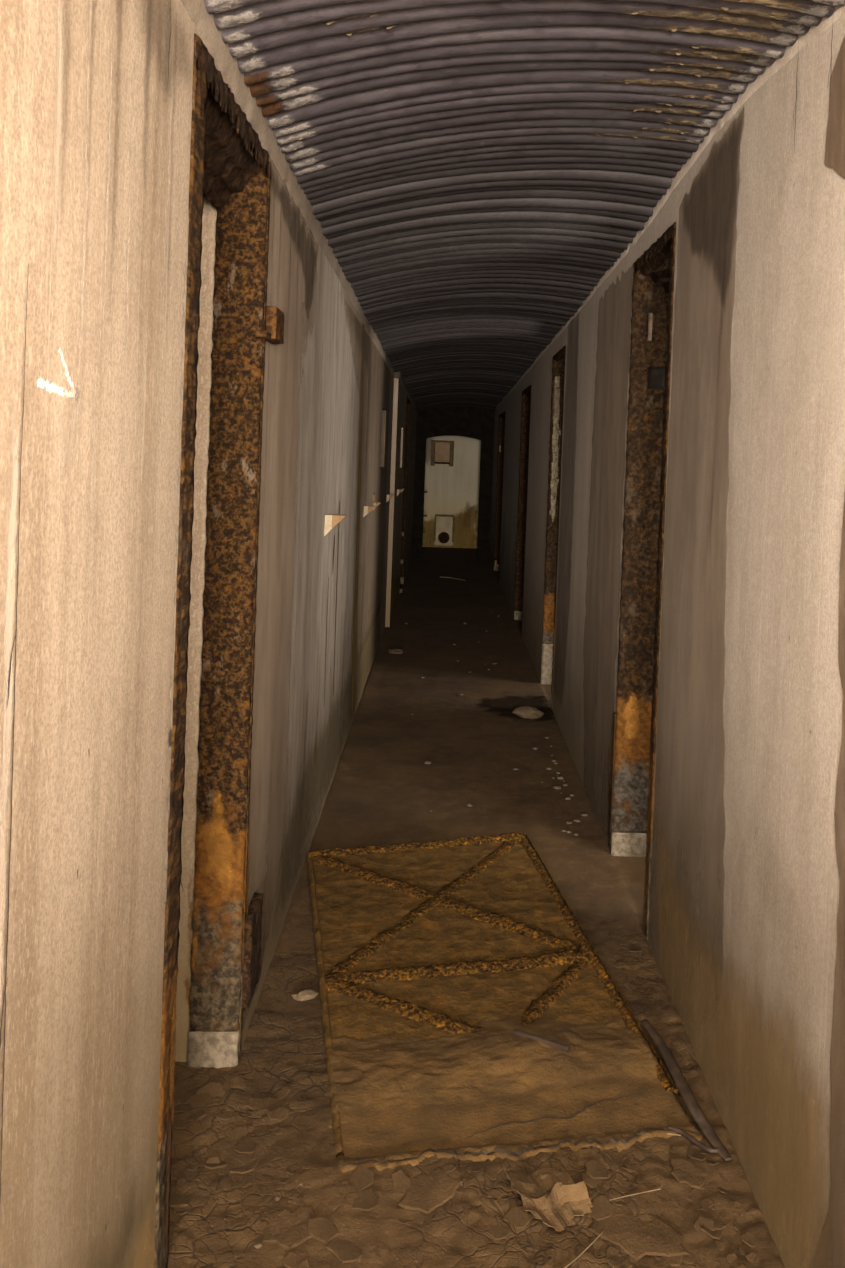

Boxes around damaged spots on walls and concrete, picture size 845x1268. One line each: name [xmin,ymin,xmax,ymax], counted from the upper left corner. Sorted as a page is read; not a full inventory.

crack [167,2,184,91]
rust [244,72,286,118]
rust [622,696,640,740]
rust [199,791,249,916]
rust [642,768,651,937]